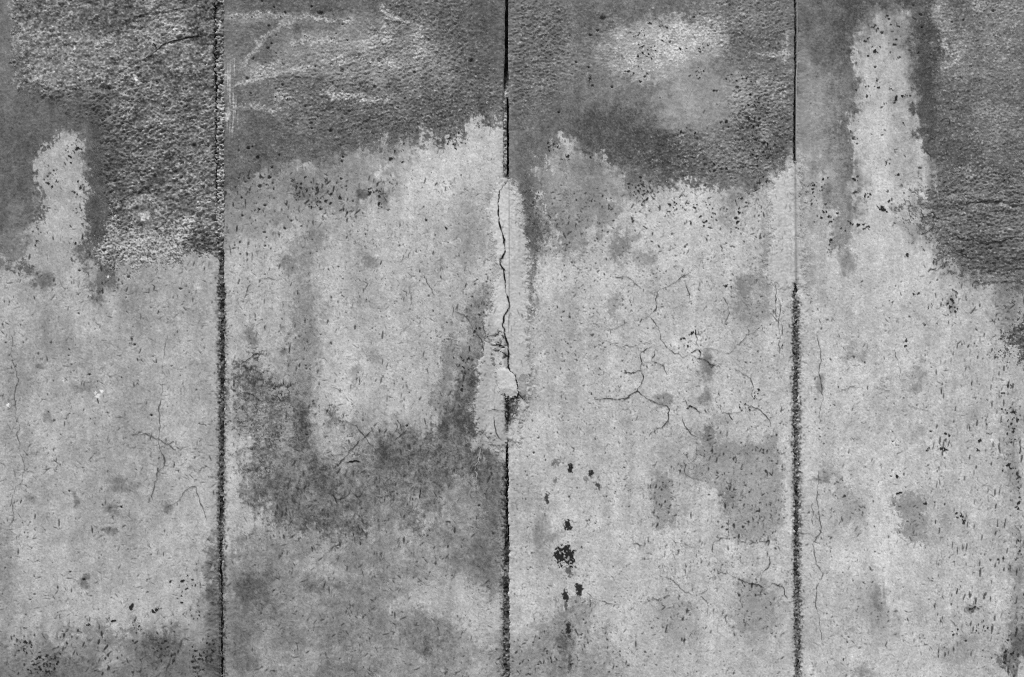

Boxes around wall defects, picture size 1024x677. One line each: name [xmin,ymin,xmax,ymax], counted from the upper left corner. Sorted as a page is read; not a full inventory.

damp [0,69,199,288]
damp [223,0,1024,285]
damp [225,332,506,564]
crack [453,182,525,479]
crack [593,272,783,479]
damp [233,565,278,670]
damp [383,612,444,655]